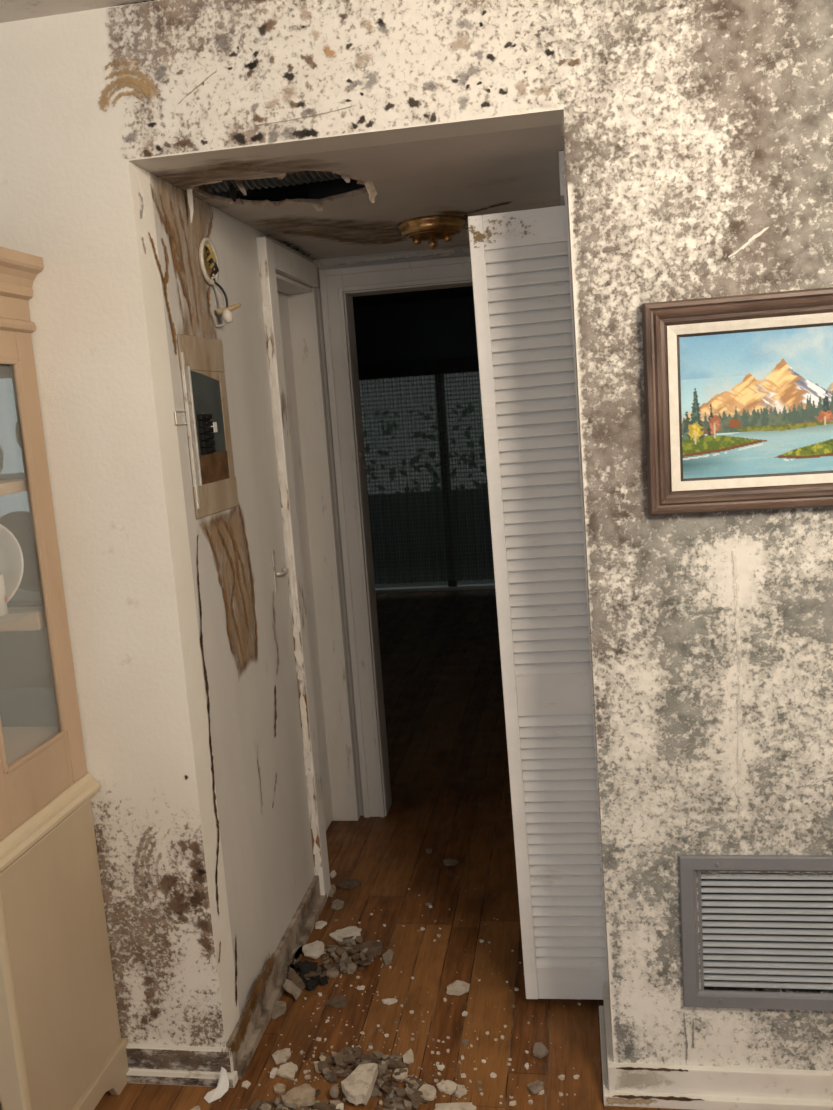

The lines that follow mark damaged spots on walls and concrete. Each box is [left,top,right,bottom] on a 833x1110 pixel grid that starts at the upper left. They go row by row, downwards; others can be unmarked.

water stain [99,0,424,158]
water stain [140,162,314,355]
spalling [187,180,333,223]
water stain [265,219,407,260]
spalling [333,171,377,203]
water stain [202,505,258,672]
water stain [394,0,833,1071]
water stain [92,801,274,1087]